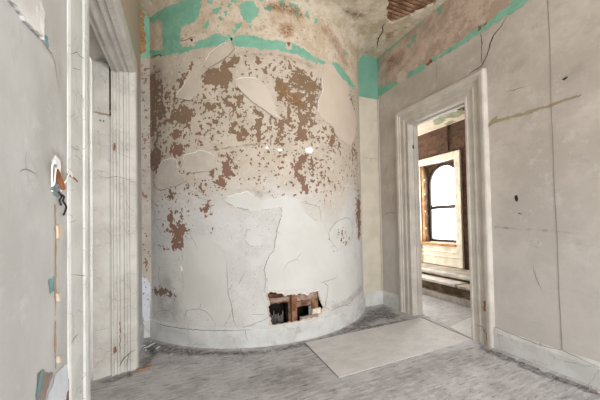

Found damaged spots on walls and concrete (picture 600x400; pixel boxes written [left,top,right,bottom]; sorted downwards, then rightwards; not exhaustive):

peeling [6,0,49,48]
peeling [378,0,531,97]
crack [470,16,507,73]
peeling [121,0,361,326]
crack [155,271,268,358]
peeling [36,356,69,400]